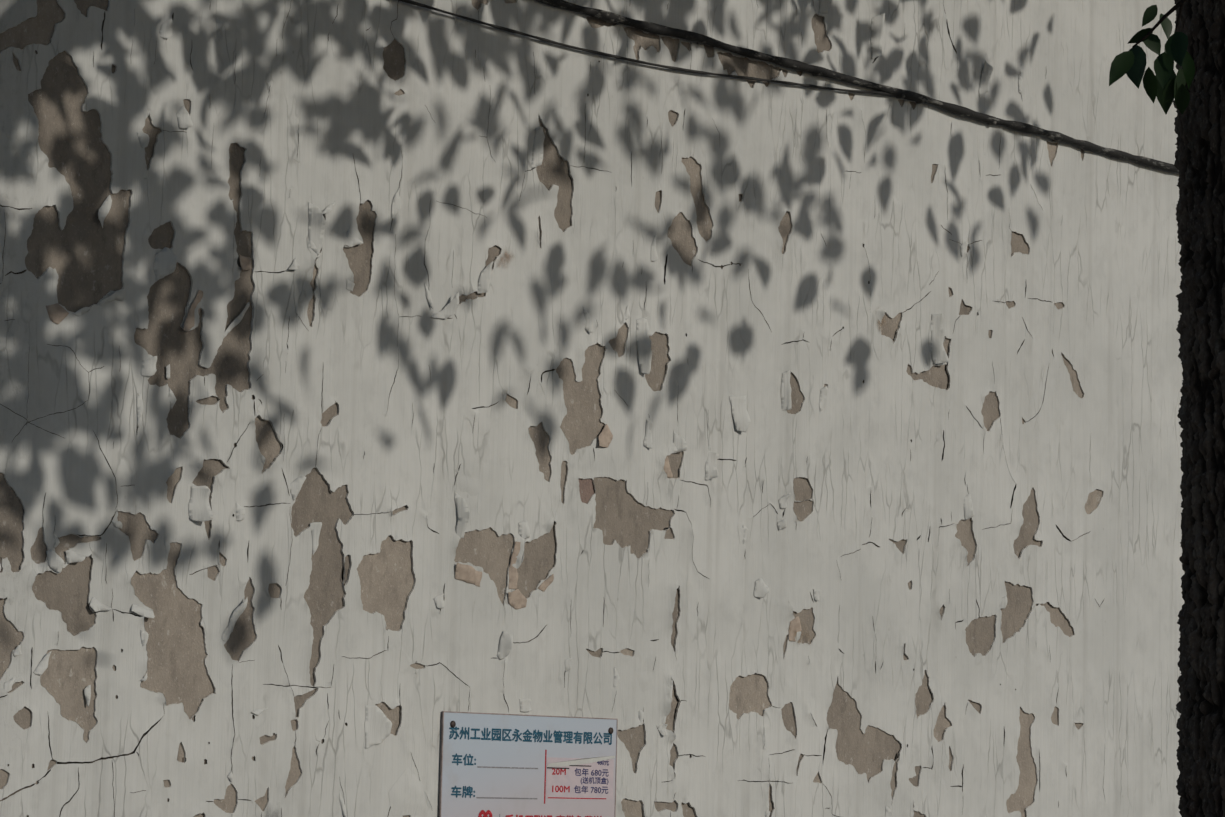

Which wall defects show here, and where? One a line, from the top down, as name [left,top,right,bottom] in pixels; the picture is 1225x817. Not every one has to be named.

spalling [0,0,132,324]
spalling [134,143,255,439]
crack [257,258,299,273]
spalling [528,306,675,559]
crack [643,419,653,449]
crack [699,451,734,485]
spalling [0,472,112,743]
crack [57,732,146,764]
spalling [112,511,216,722]
spalling [285,468,415,798]
crack [497,631,524,659]
crack [738,750,822,782]